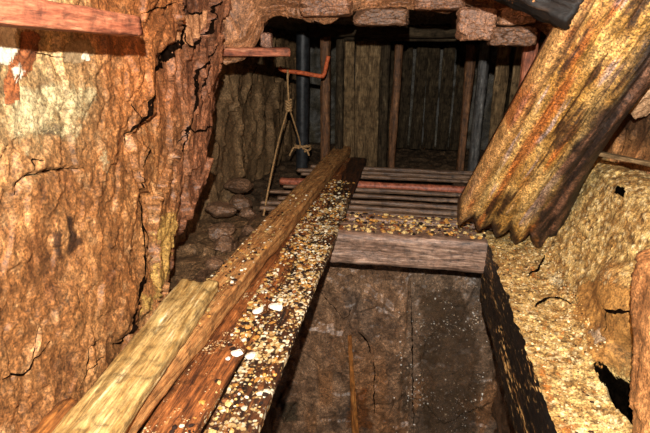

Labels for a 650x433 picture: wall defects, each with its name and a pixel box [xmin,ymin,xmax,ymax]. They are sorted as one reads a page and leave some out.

crack [141,0,223,152]
crack [124,92,156,143]
crack [14,158,84,195]
crack [79,146,151,389]
crack [528,255,550,276]
crack [534,297,573,307]
crack [604,309,630,331]